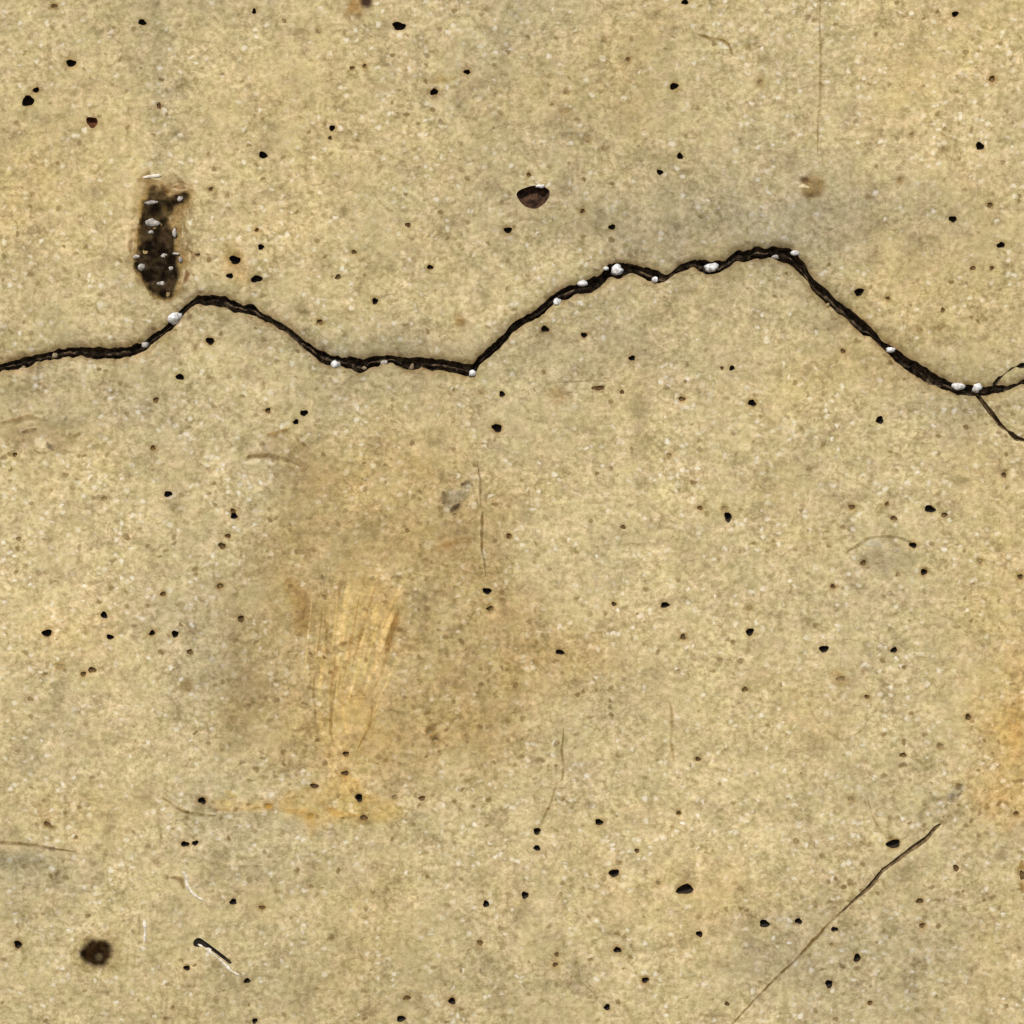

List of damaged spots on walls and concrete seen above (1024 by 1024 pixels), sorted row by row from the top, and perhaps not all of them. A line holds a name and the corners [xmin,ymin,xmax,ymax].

crack [0,246,1024,442]